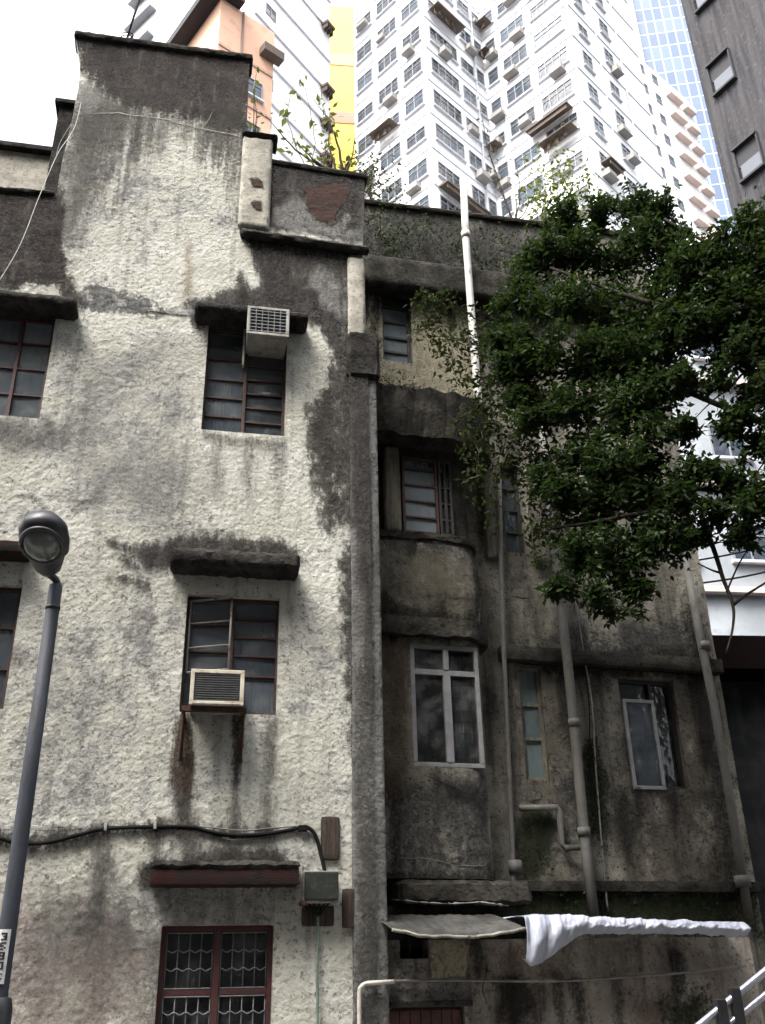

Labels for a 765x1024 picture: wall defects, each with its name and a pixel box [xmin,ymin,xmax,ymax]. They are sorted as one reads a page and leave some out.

water stain [0,38,250,311]
spalling [302,183,350,233]
water stain [166,239,495,1024]
rust [169,714,194,817]
water stain [137,833,160,890]
water stain [470,939,588,1024]
water stain [667,949,688,997]